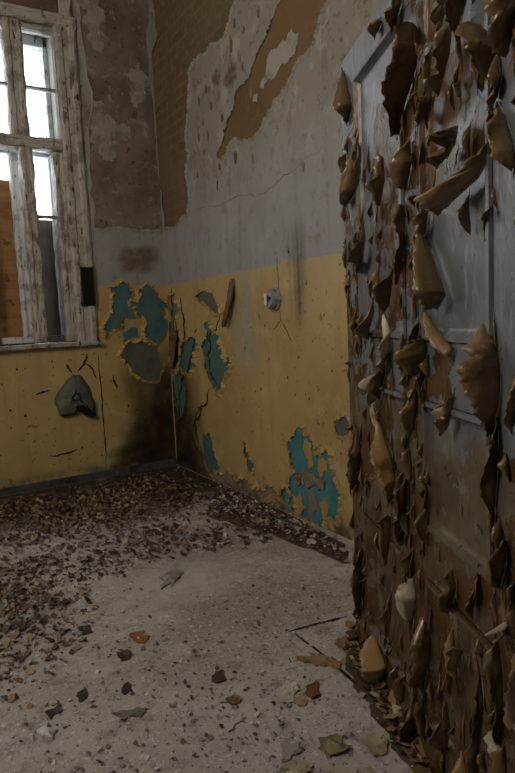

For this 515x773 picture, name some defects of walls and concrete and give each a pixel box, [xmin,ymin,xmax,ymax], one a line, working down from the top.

spalling [73,0,330,235]
peeling [98,278,235,420]
peeling [202,0,515,567]
peeling [349,532,364,619]
peeling [465,539,506,621]
peeling [334,578,451,763]
peeling [451,598,515,773]